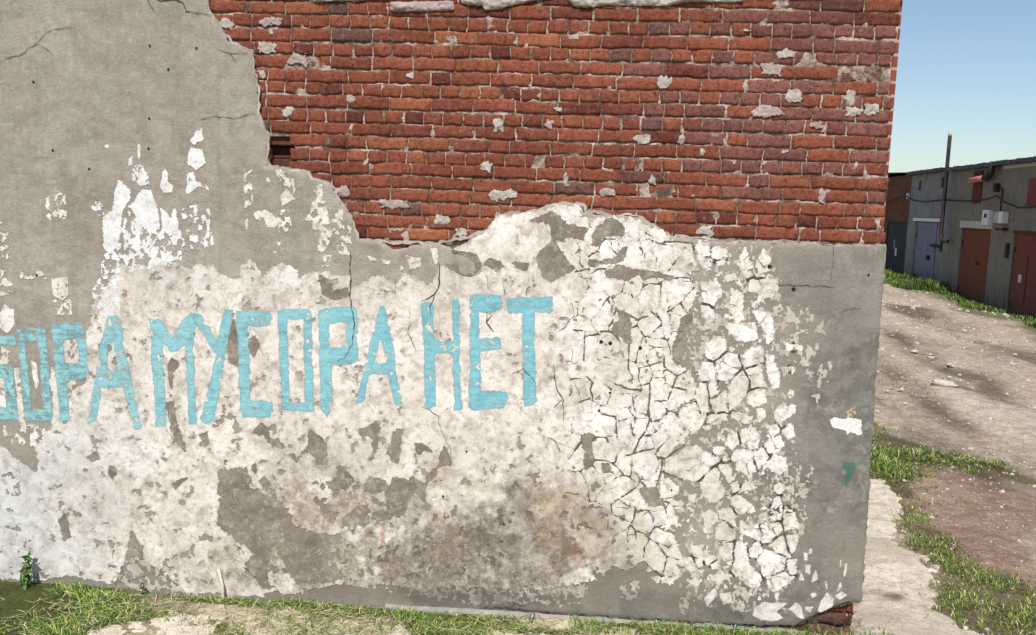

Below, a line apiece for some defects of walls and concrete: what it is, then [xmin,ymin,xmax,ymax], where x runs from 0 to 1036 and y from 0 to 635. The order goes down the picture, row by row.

peeling [186,128,209,194]
peeling [0,222,72,333]
peeling [302,184,352,255]
crack [337,253,355,362]
crack [406,262,440,350]
peeling [530,211,588,283]
peeling [591,217,625,248]
peeling [588,247,674,282]
peeling [581,433,612,474]
crack [488,204,834,629]
peeling [215,467,343,587]
spalling [678,549,860,635]